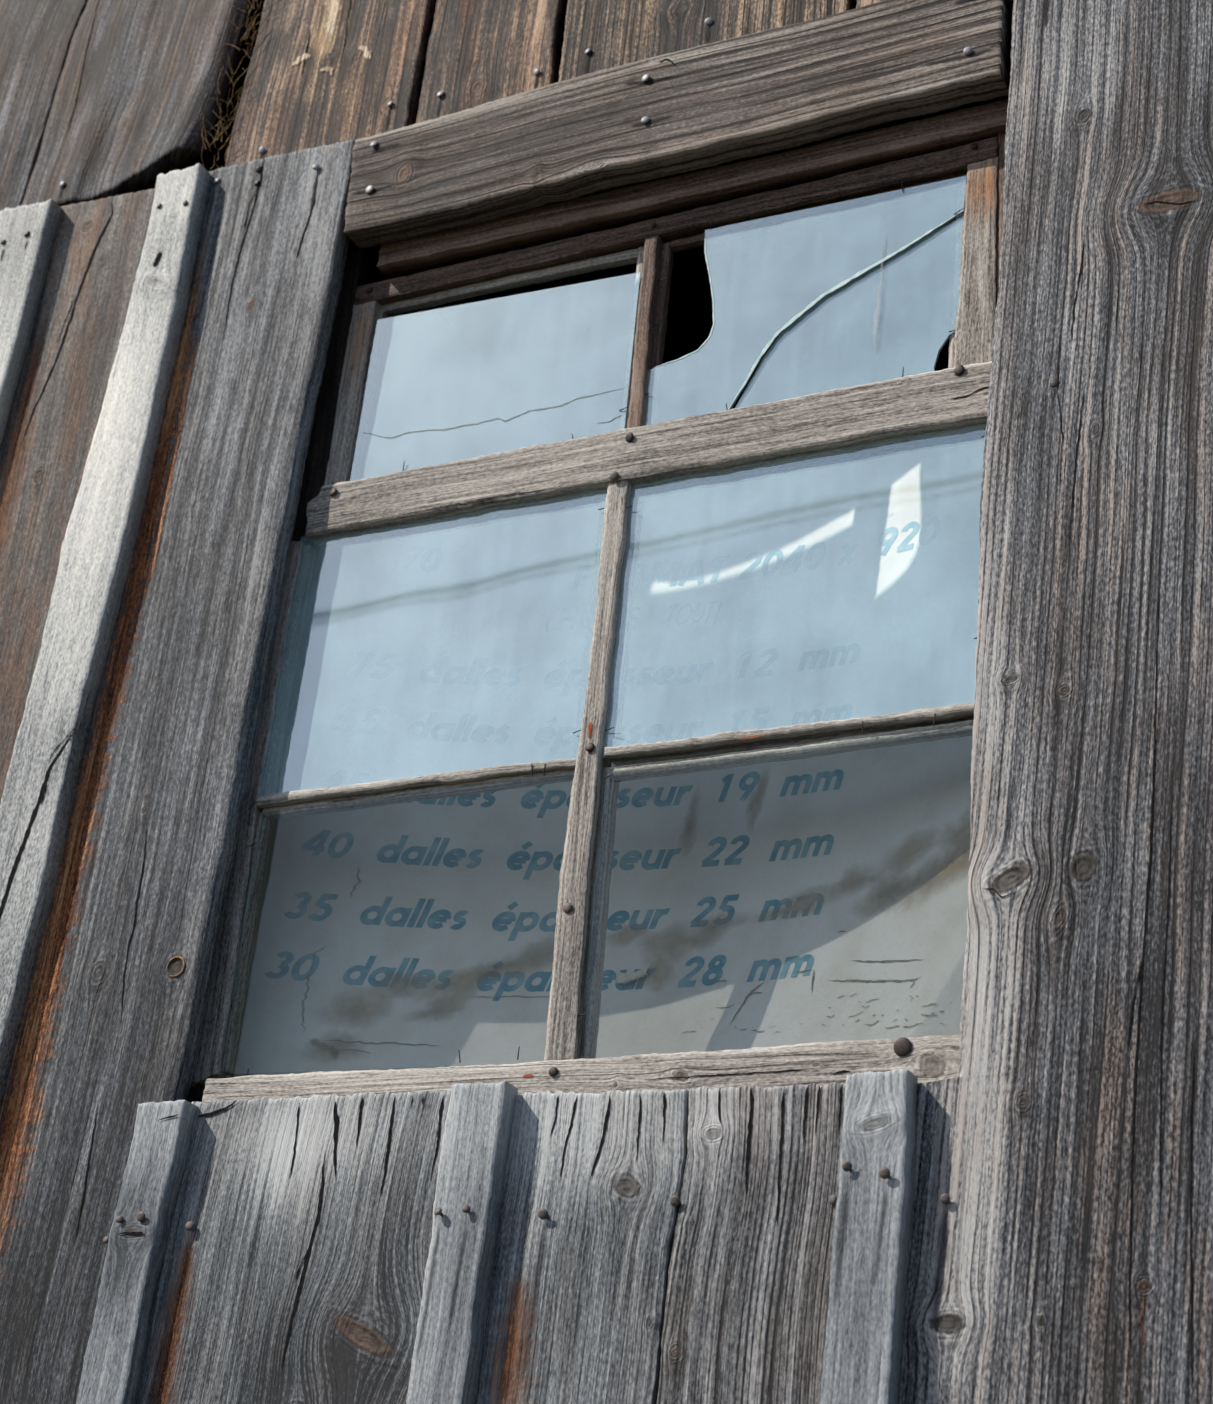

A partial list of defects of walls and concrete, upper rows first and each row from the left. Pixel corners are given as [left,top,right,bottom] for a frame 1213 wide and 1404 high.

crack [0,715,87,917]
crack [280,1095,444,1374]